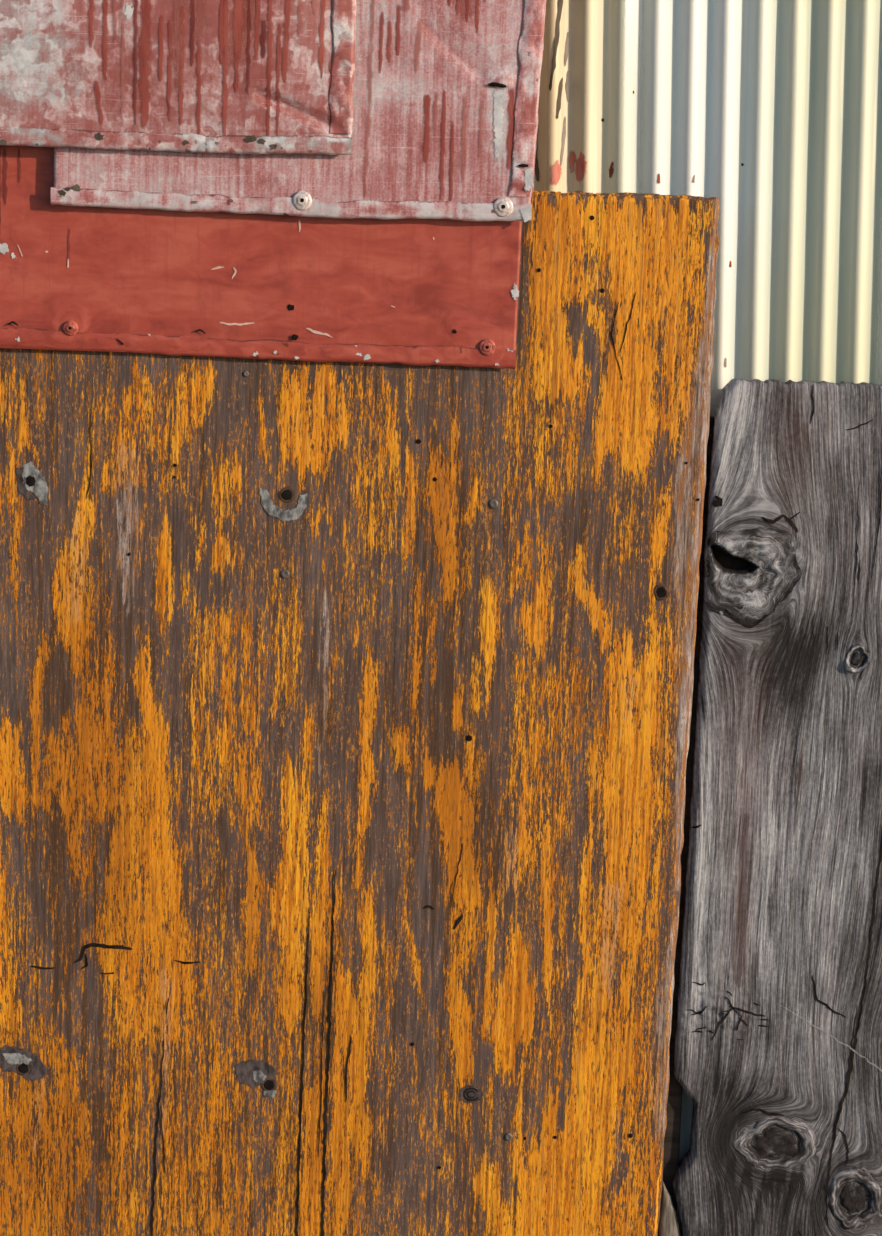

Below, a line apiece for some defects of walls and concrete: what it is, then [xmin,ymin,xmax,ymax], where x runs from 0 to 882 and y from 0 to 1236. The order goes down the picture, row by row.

peeling [492,90,505,162]
crack [808,384,816,424]
crack [762,512,800,533]
crack [812,420,882,679]
crack [725,609,775,628]
peeling [0,167,715,1236]
crack [31,943,132,974]
crack [689,982,770,1040]
crack [798,838,882,1236]
crack [743,1108,784,1116]